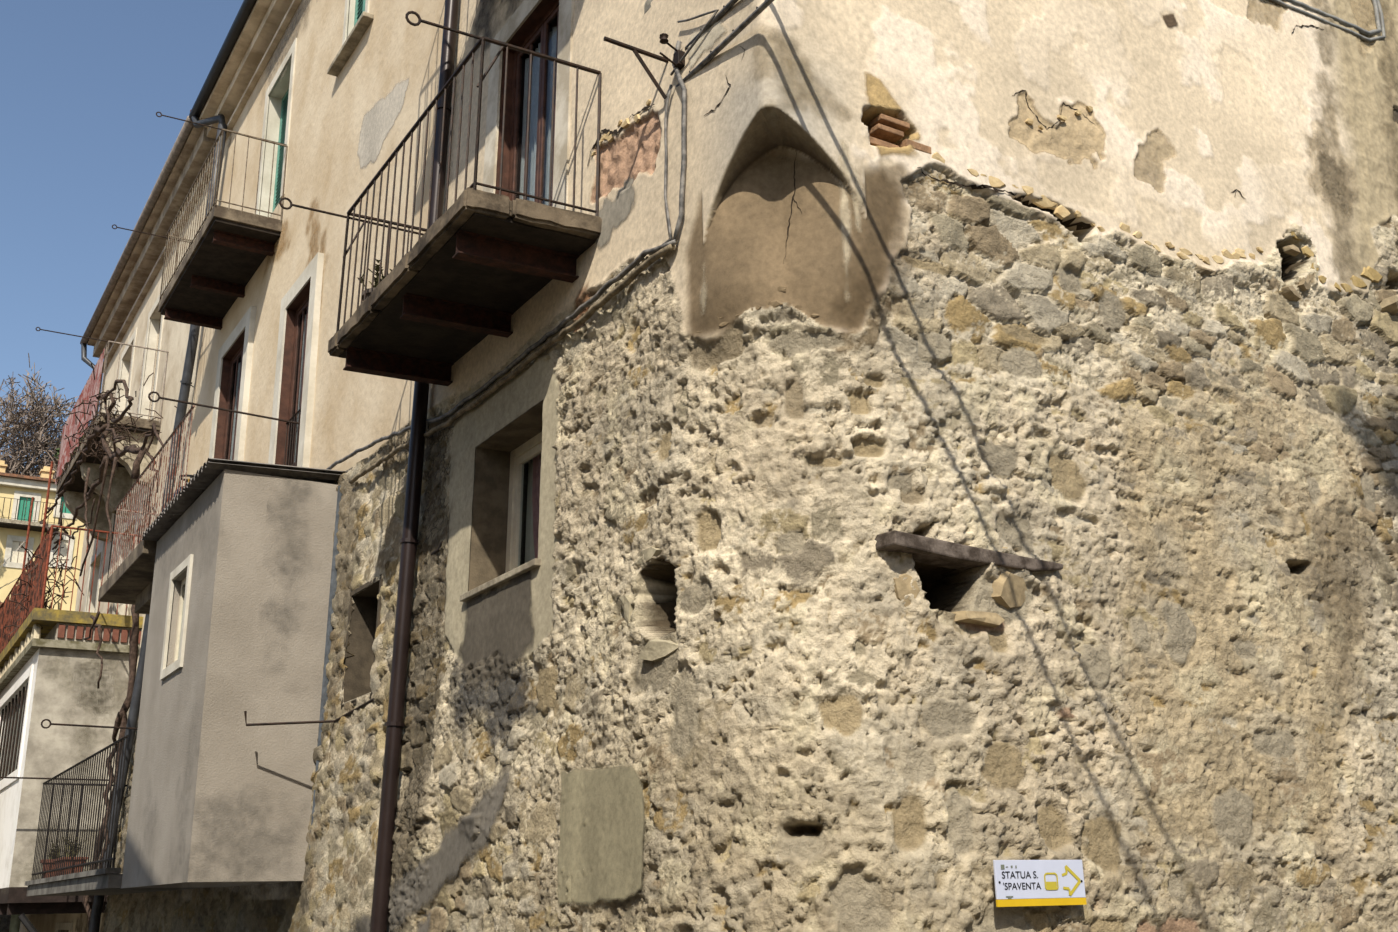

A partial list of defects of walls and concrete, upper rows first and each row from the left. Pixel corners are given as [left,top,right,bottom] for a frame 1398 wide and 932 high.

leakage [474,0,515,49]
flaking render [357,78,409,168]
flaking render [591,99,661,248]
crack [783,152,802,264]
crack [917,167,1092,230]
flaking render [1008,92,1106,169]
flaking render [1134,130,1174,193]
leakage [1319,30,1338,161]